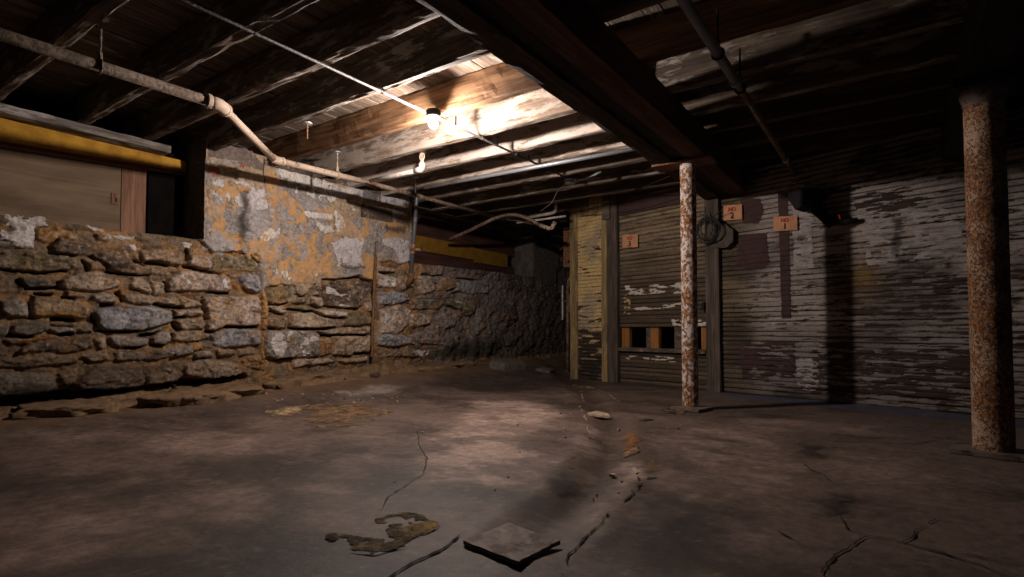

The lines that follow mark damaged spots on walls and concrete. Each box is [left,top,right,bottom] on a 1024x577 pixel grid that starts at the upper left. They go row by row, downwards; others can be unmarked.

peeling [201,147,410,286]
peeling [624,282,682,326]
peeling [736,192,815,319]
peeling [854,192,968,294]
peeling [736,340,971,399]
crack [383,431,428,506]
crack [562,476,642,575]
crack [821,512,1013,577]